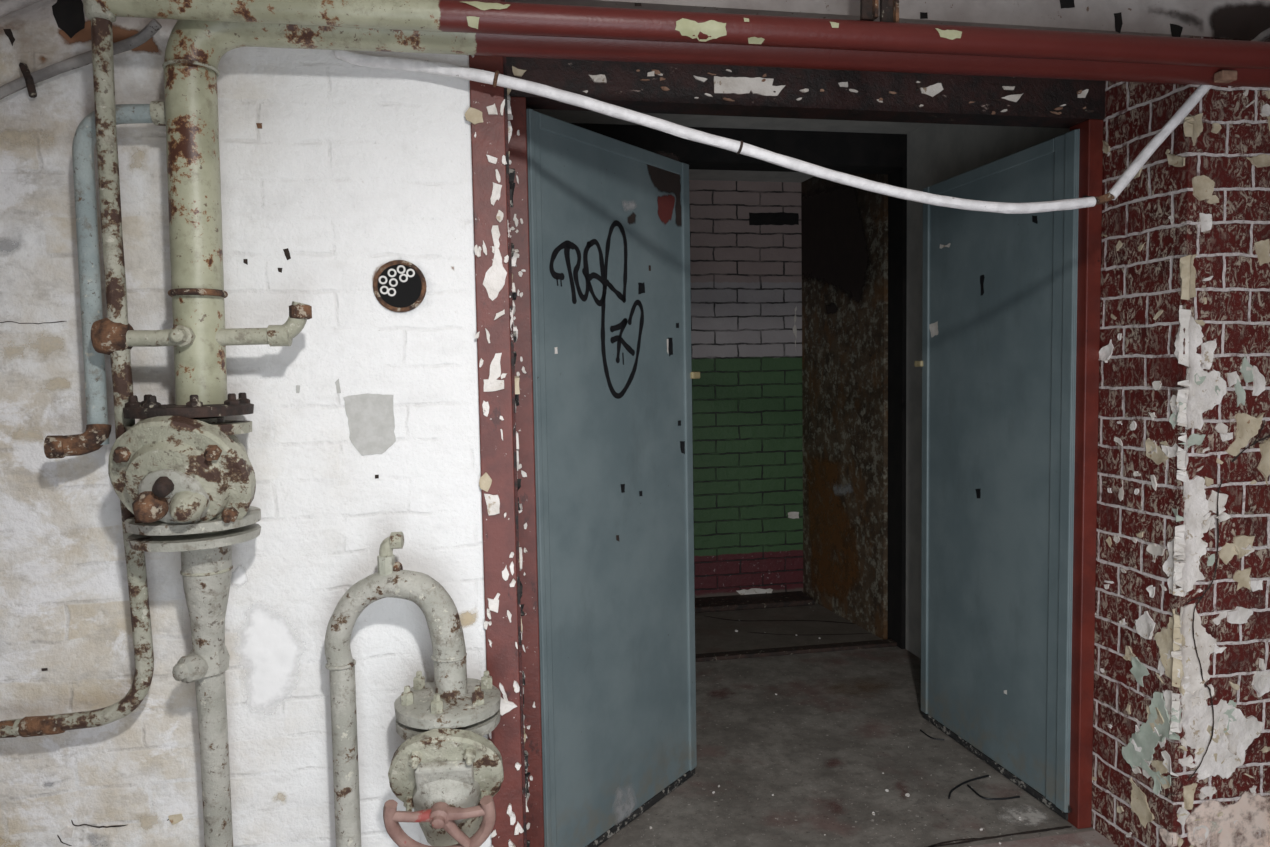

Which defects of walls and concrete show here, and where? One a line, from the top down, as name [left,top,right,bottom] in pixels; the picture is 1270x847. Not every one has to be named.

peeling [583,74,607,93]
peeling [694,69,824,102]
peeling [877,81,943,107]
peeling [969,86,1025,115]
peeling [1050,89,1094,115]
peeling [1165,113,1221,232]
peeling [1246,154,1270,168]
peeling [1254,239,1270,266]
peeling [465,66,527,529]
peeling [1099,314,1122,363]
peeling [459,547,527,652]
peeling [491,671,536,847]